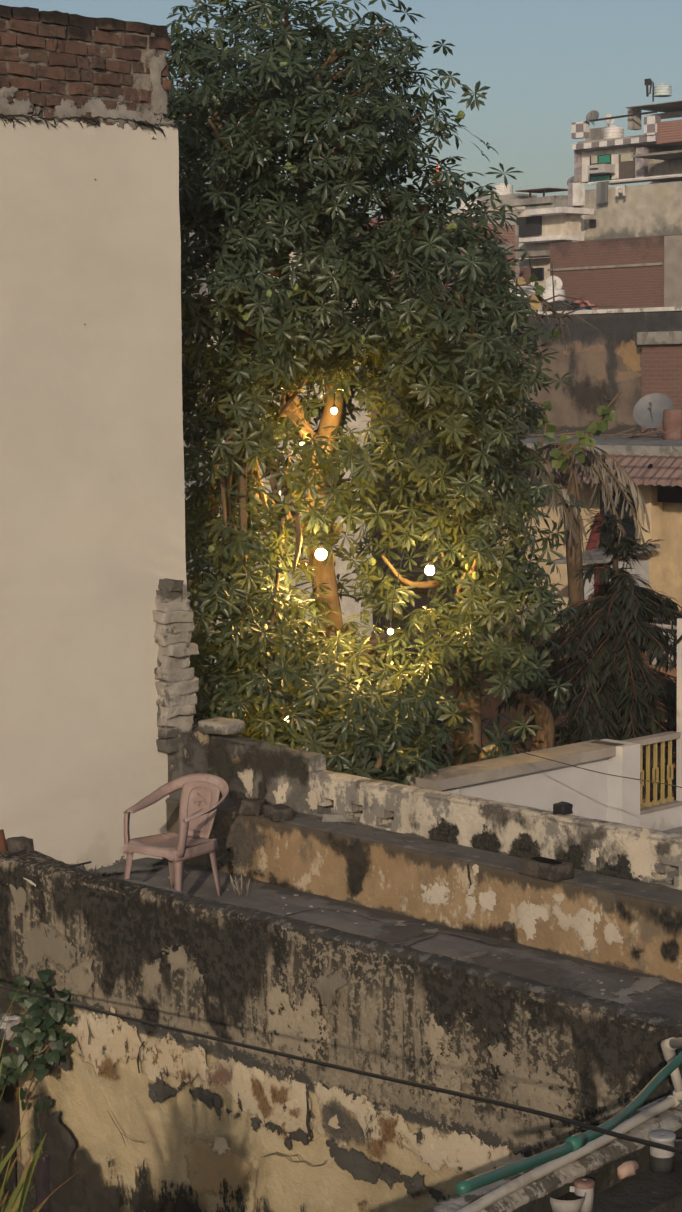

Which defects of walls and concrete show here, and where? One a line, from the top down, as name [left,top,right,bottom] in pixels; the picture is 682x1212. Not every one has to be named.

peeling [0,113,181,137]
leakage [530,311,677,415]
spalling [305,790,355,822]
leakage [478,803,526,826]
peeling [563,827,659,881]
leakage [0,855,287,1040]
crack [408,864,621,974]
peeling [461,892,624,954]
leakage [651,908,682,962]
peeling [7,880,586,1202]
leakage [412,954,682,1125]
leakage [0,1078,270,1212]